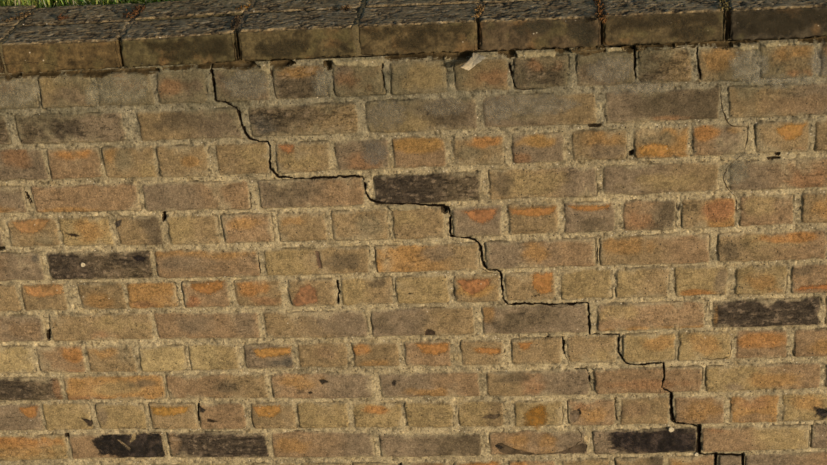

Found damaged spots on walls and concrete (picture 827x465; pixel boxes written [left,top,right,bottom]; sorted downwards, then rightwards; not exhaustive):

crack [210,64,748,465]